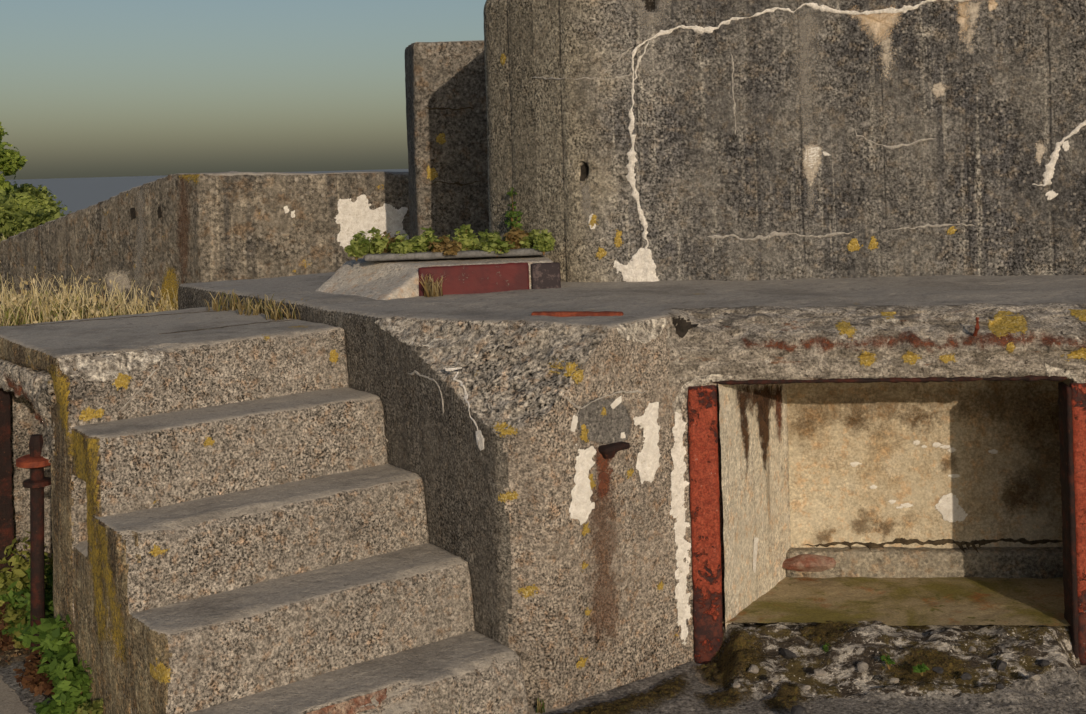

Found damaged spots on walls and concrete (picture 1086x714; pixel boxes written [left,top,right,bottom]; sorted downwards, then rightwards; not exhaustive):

crack [532,0,974,282]
crack [1032,120,1086,200]
peeling [334,194,409,249]
rust [743,331,1086,352]
peeling [569,415,597,525]
rust [596,450,613,498]
peeling [621,374,732,645]
rust [737,384,782,479]